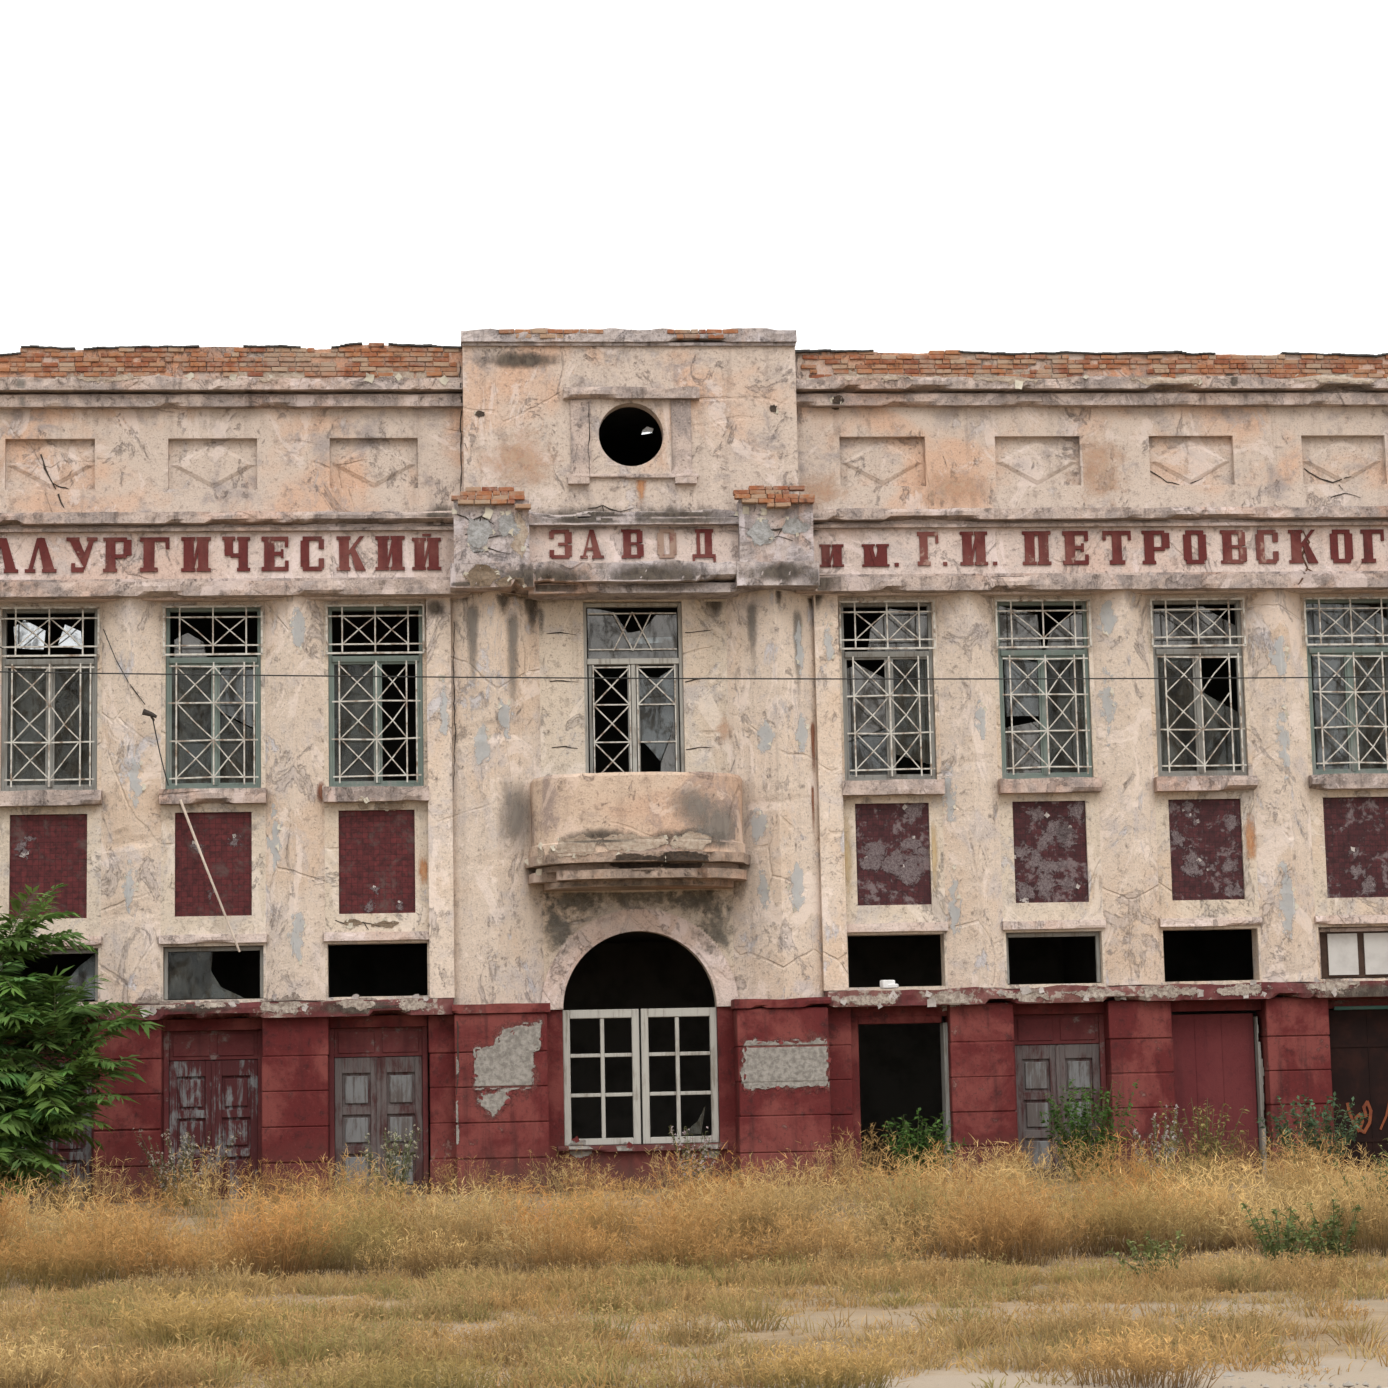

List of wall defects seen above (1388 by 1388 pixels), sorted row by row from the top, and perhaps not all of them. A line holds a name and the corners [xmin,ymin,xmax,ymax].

crack [40,454,68,507]
peeling [857,803,933,886]
peeling [1014,802,1087,903]
leakage [545,877,733,952]
peeling [135,993,239,1017]
peeling [333,994,377,1011]
peeling [840,989,898,1009]
peeling [925,990,973,1011]
peeling [997,980,1267,1004]
peeling [1307,977,1360,997]
peeling [456,1015,544,1121]
peeling [732,1030,831,1096]